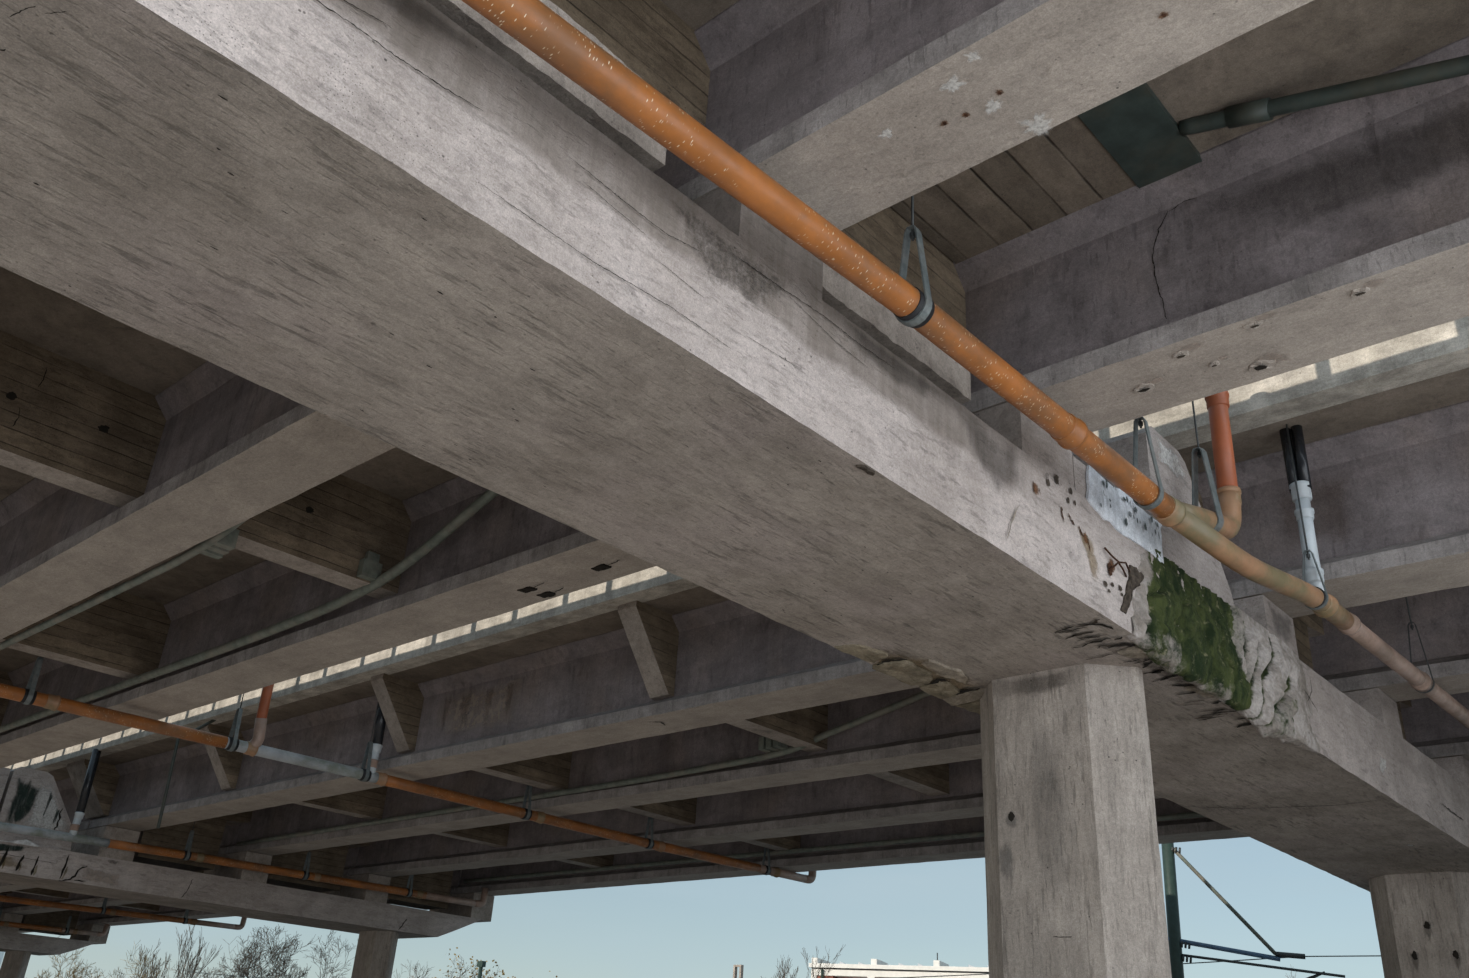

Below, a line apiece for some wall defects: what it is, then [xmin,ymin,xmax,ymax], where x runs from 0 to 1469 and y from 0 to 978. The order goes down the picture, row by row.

crack [1152,198,1195,319]
spalling [1104,547,1144,614]
peeling [834,644,984,714]
spalling [1054,605,1321,754]